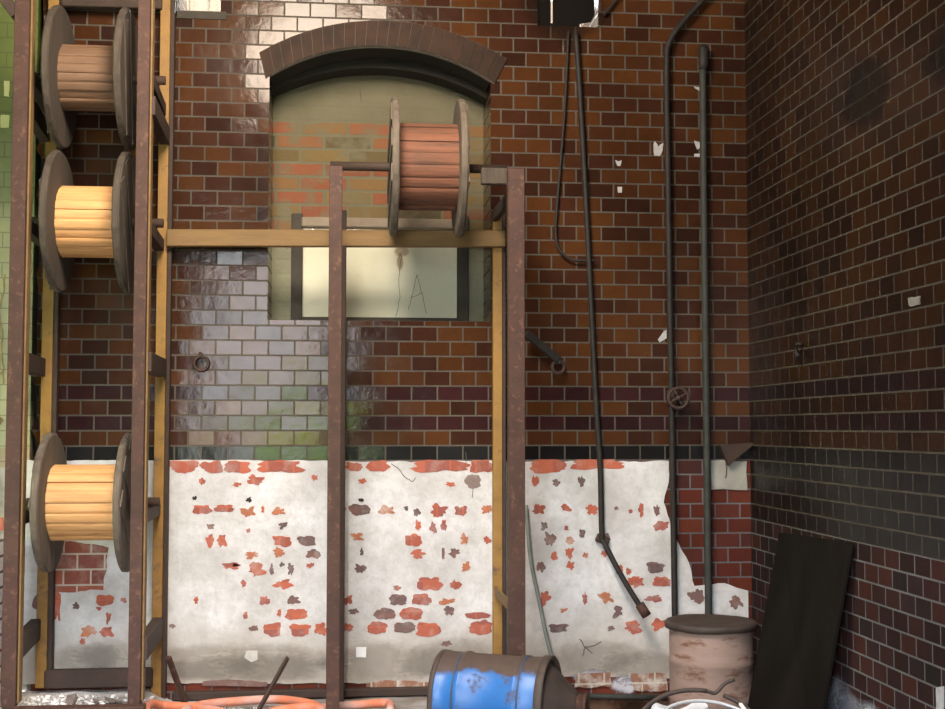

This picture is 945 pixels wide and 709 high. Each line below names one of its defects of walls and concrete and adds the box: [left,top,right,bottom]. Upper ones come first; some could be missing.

flaking render [170,460,318,487]
flaking render [345,460,390,484]
flaking render [410,460,492,489]
flaking render [530,459,624,487]
flaking render [345,498,467,559]
flaking render [532,504,588,573]
flaking render [614,503,669,531]
flaking render [54,541,127,645]
flaking render [192,496,326,637]
flaking render [367,532,492,647]
flaking render [582,592,665,635]
flaking render [616,562,671,603]